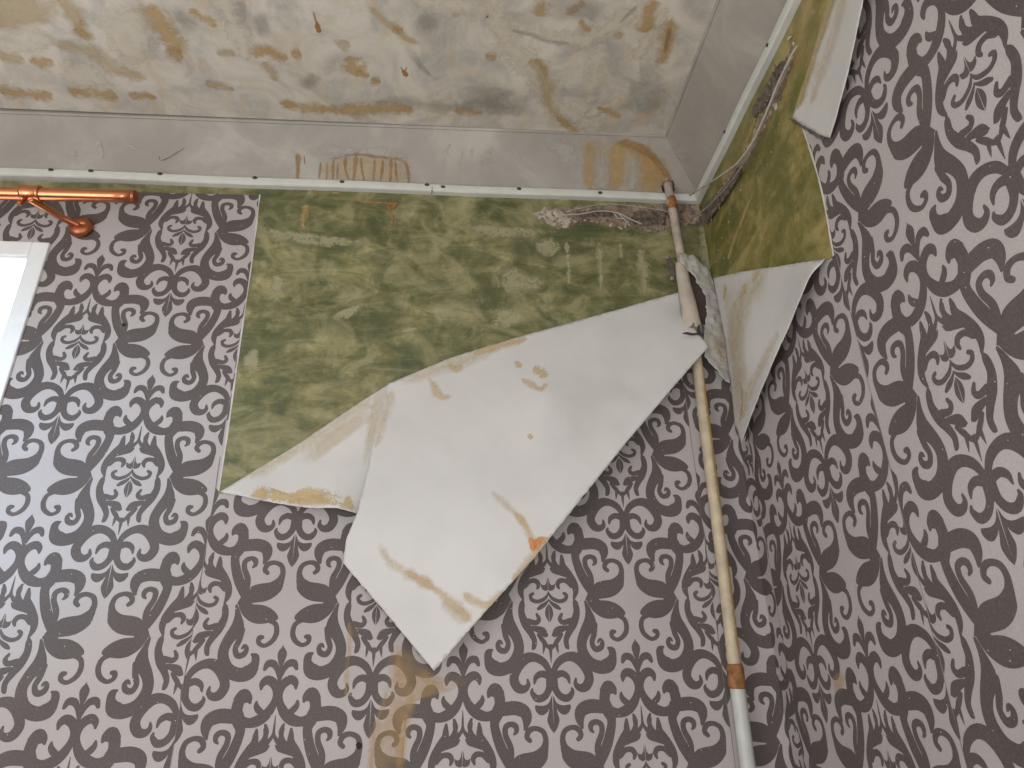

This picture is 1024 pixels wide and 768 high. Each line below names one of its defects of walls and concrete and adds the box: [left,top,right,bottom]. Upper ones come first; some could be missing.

leakage [60,0,183,99]
leakage [190,0,301,80]
leakage [338,41,380,84]
leakage [415,0,634,132]
leakage [281,101,412,115]
leakage [552,141,673,189]
peeling [0,0,863,670]